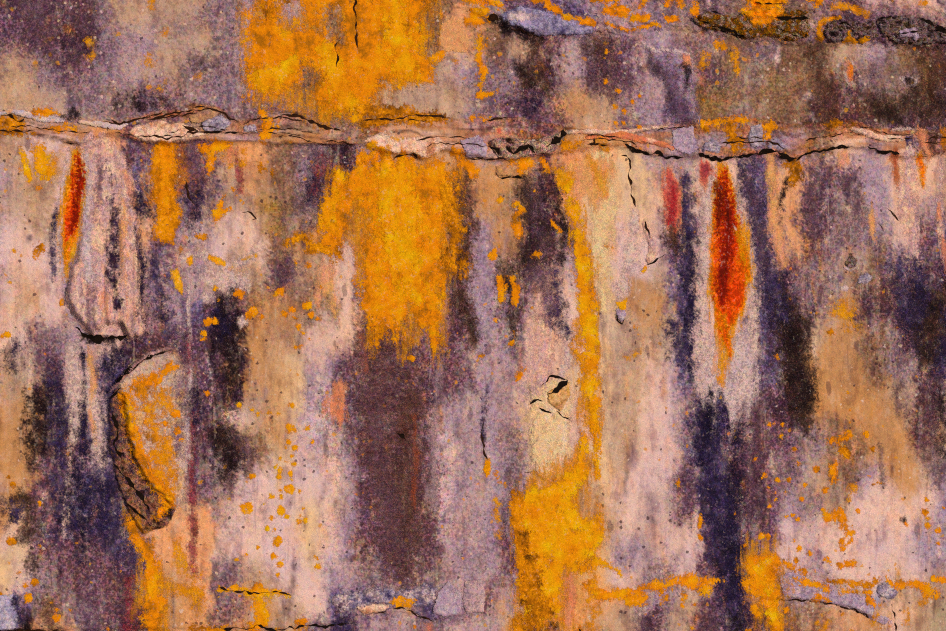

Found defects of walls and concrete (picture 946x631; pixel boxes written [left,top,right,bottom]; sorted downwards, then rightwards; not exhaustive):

rust [58,147,86,278]
crack [0,106,353,145]
peeling [489,6,593,47]
crack [363,114,946,265]
rust [661,167,683,245]
rust [699,159,756,388]
water stain [804,43,836,125]
water stain [868,45,946,484]
flaking render [108,346,193,534]
flaking render [524,378,574,479]
water stain [661,160,819,631]
crack [779,599,869,618]